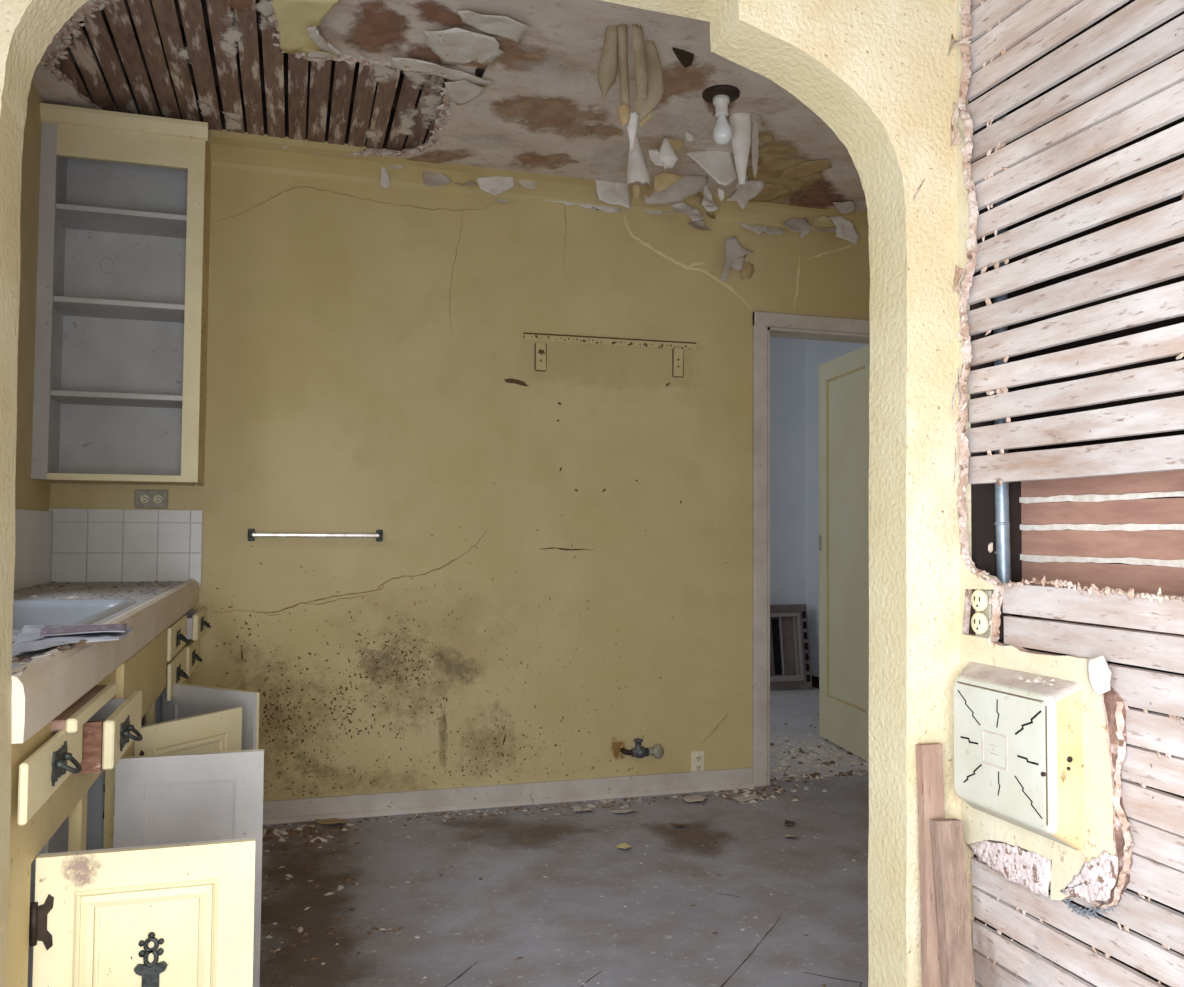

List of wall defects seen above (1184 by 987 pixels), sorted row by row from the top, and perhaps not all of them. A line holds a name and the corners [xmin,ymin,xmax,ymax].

flaking render [40,0,454,188]
water stain [347,2,455,66]
water stain [416,2,472,28]
water stain [469,41,621,136]
spalling [673,47,694,68]
peeling [648,113,764,209]
crack [210,181,488,325]
crack [624,214,753,311]
flaking render [947,0,1184,987]
crack [212,532,486,616]
crack [543,544,594,552]
water stain [208,577,642,796]